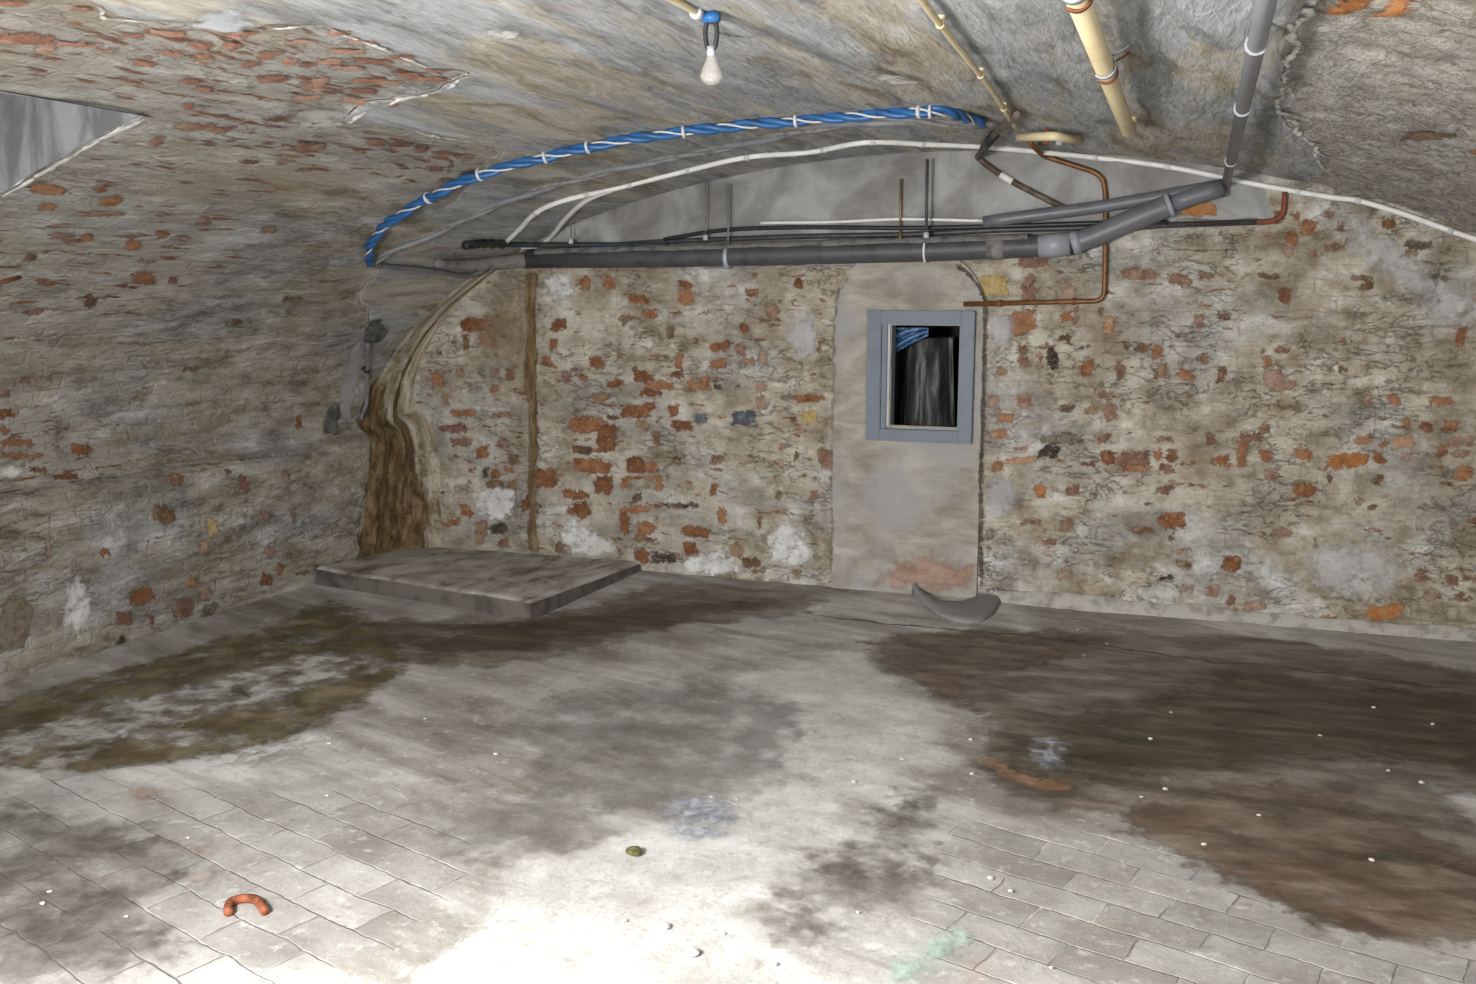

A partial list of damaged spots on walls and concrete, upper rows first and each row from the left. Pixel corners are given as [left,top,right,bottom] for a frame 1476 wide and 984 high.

damp [0,551,823,772]
damp [863,628,1476,942]